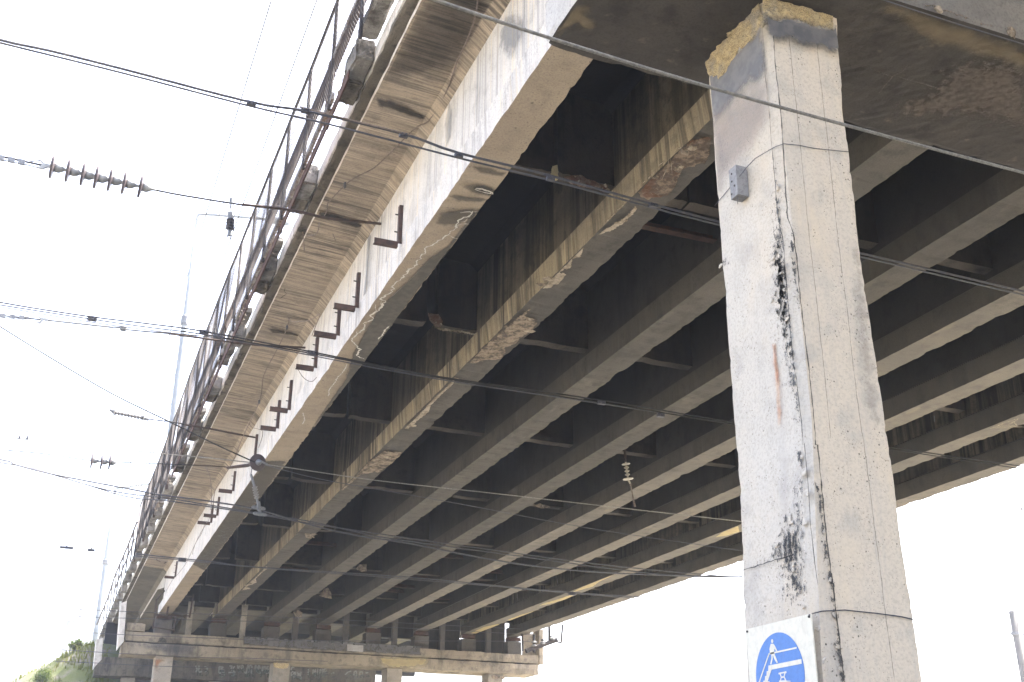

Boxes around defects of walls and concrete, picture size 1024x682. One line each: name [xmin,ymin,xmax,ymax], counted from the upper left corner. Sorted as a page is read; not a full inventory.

spalling [551,165,609,190]
spalling [600,137,712,234]
crack [328,211,473,395]
spalling [470,310,538,364]
crack [741,37,844,678]
spalling [342,451,402,490]